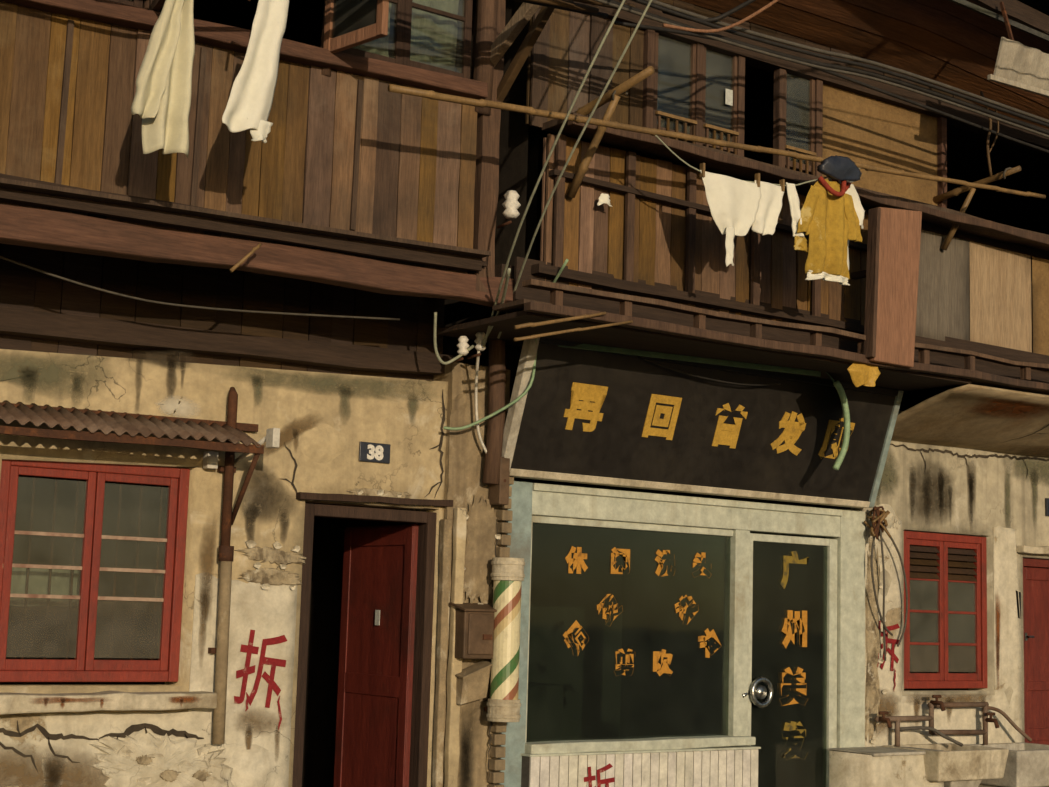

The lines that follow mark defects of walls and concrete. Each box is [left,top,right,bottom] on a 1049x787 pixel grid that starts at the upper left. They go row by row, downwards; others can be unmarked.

leakage [0,357,96,393]
leakage [137,352,191,415]
rust [979,400,1043,416]
leakage [877,458,897,500]
leakage [910,470,952,516]
peeling [235,540,306,590]
crack [0,720,204,772]
peeling [88,731,235,787]